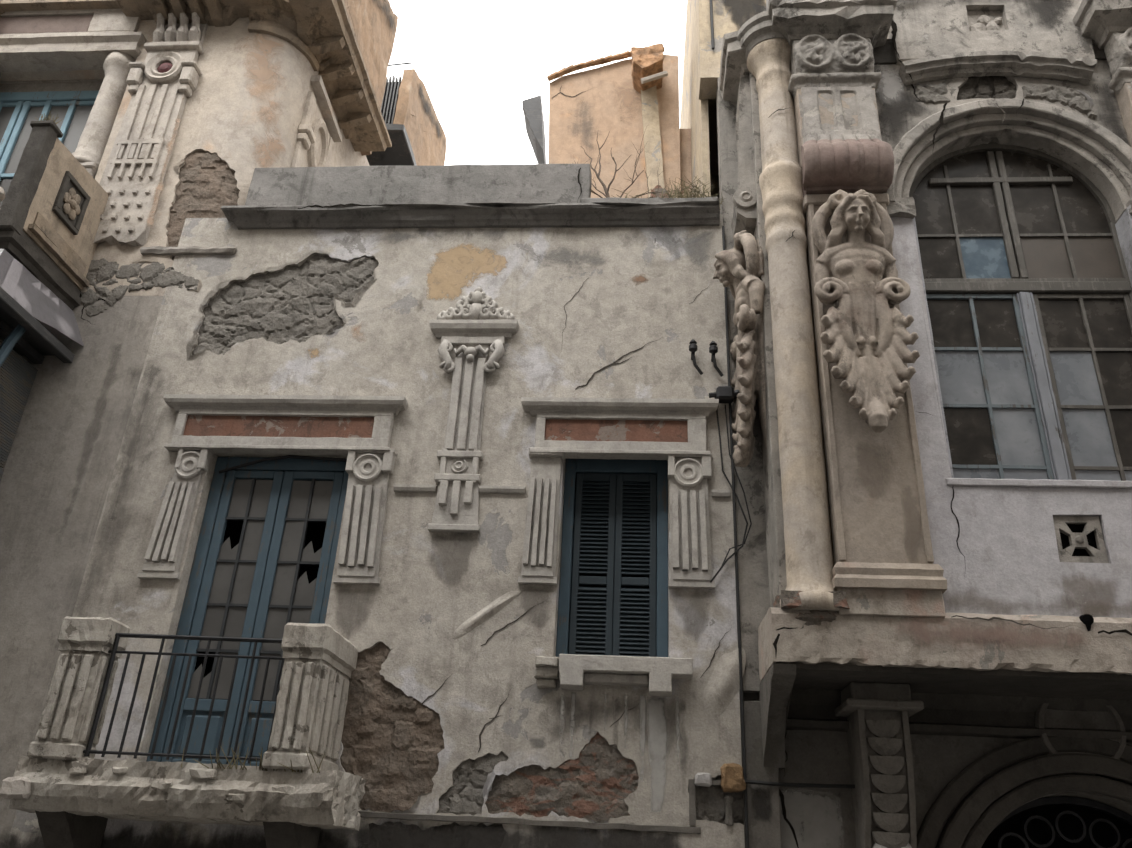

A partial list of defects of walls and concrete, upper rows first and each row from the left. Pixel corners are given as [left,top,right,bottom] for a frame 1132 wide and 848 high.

flaking render [81,151,379,361]
crack [575,340,657,390]
crack [951,487,965,558]
crack [952,615,1132,636]
flaking render [340,642,639,832]